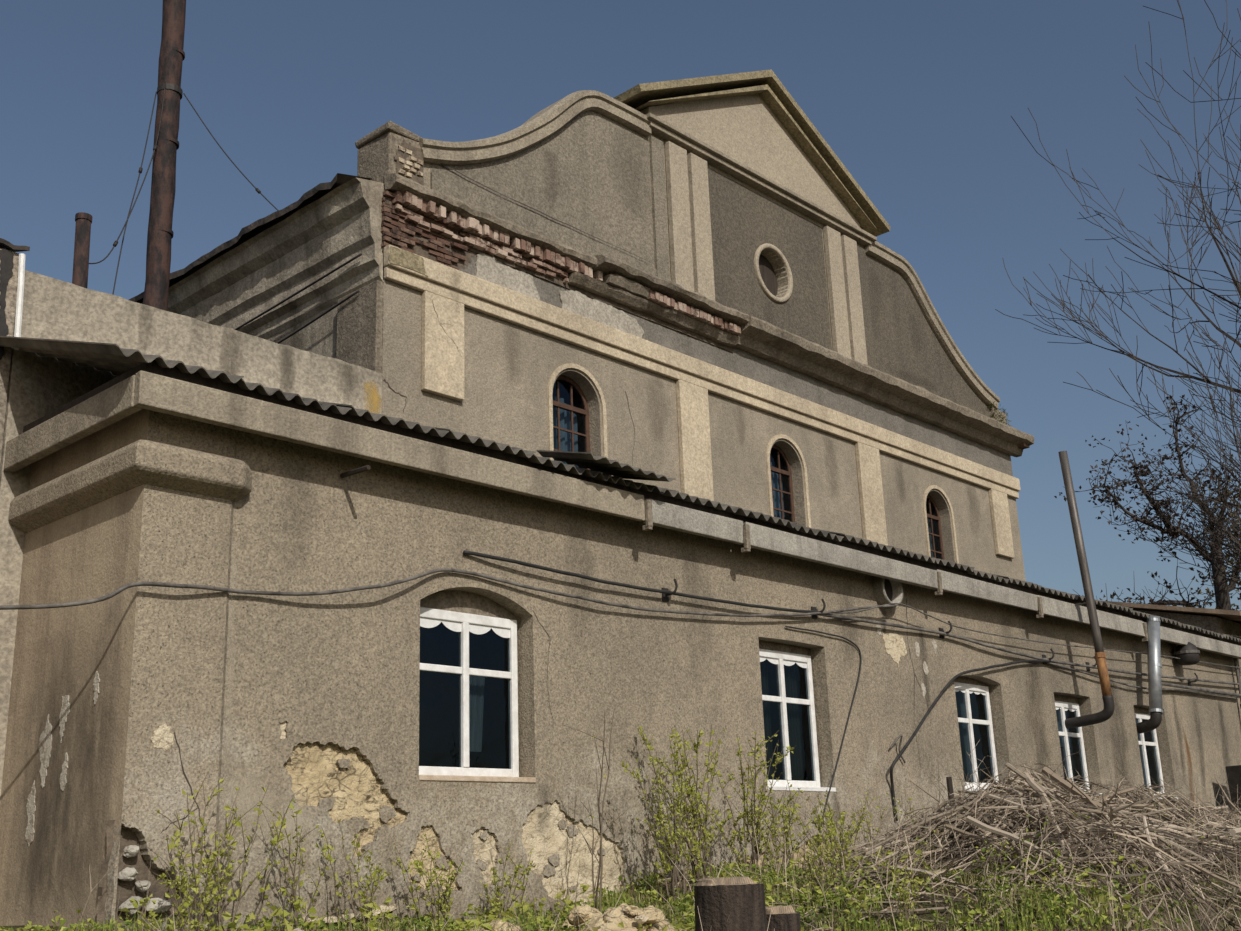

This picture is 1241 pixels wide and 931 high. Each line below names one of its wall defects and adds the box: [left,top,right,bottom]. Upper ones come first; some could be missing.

flaking render [381,189,741,352]
peeling [876,625,937,698]
peeling [151,723,174,751]
crack [160,732,209,858]
flaking render [279,721,407,856]
flaking render [97,820,183,931]
flaking render [407,826,459,899]
flaking render [471,827,497,889]
flaking render [522,801,623,906]